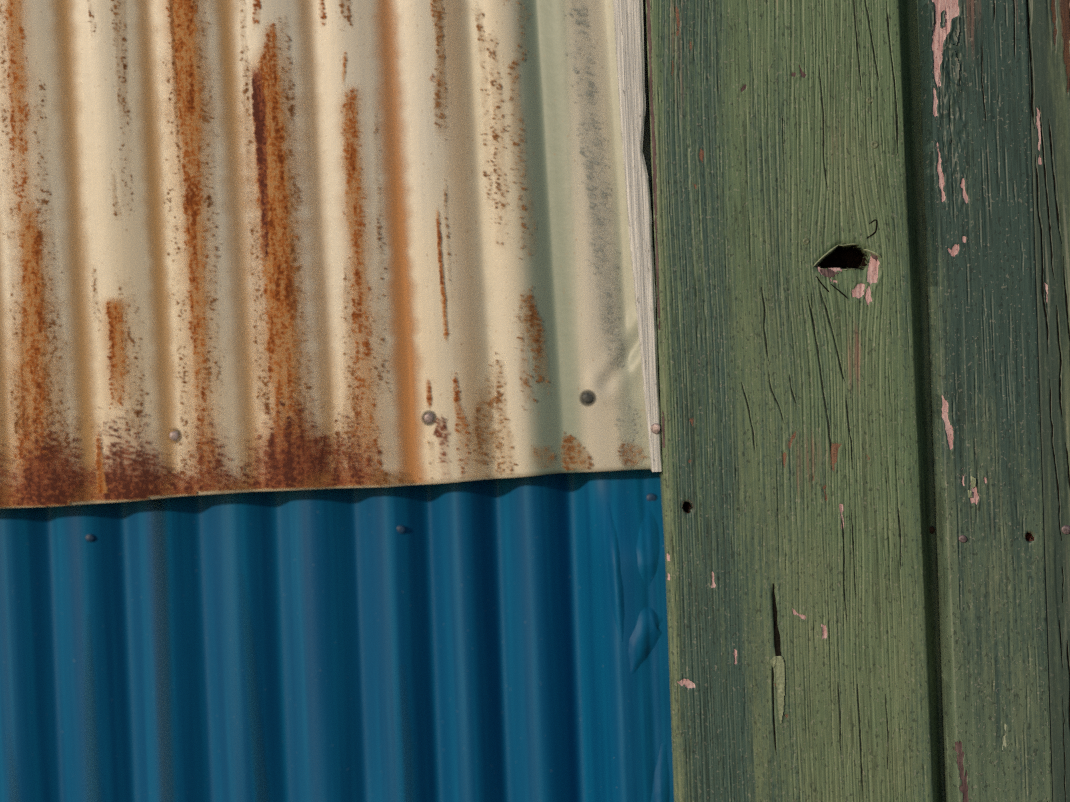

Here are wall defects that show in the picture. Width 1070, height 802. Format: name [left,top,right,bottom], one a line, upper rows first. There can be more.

peeling [930,0,960,117]
peeling [1051,0,1070,93]
corrosion [474,1,536,259]
peeling [937,142,946,202]
corrosion [0,0,517,506]
peeling [814,243,881,305]
corrosion [515,286,550,410]
corrosion [531,432,593,471]
peeling [942,395,953,450]
peeling [677,679,695,688]
crack [770,583,785,751]
peeling [953,741,969,802]